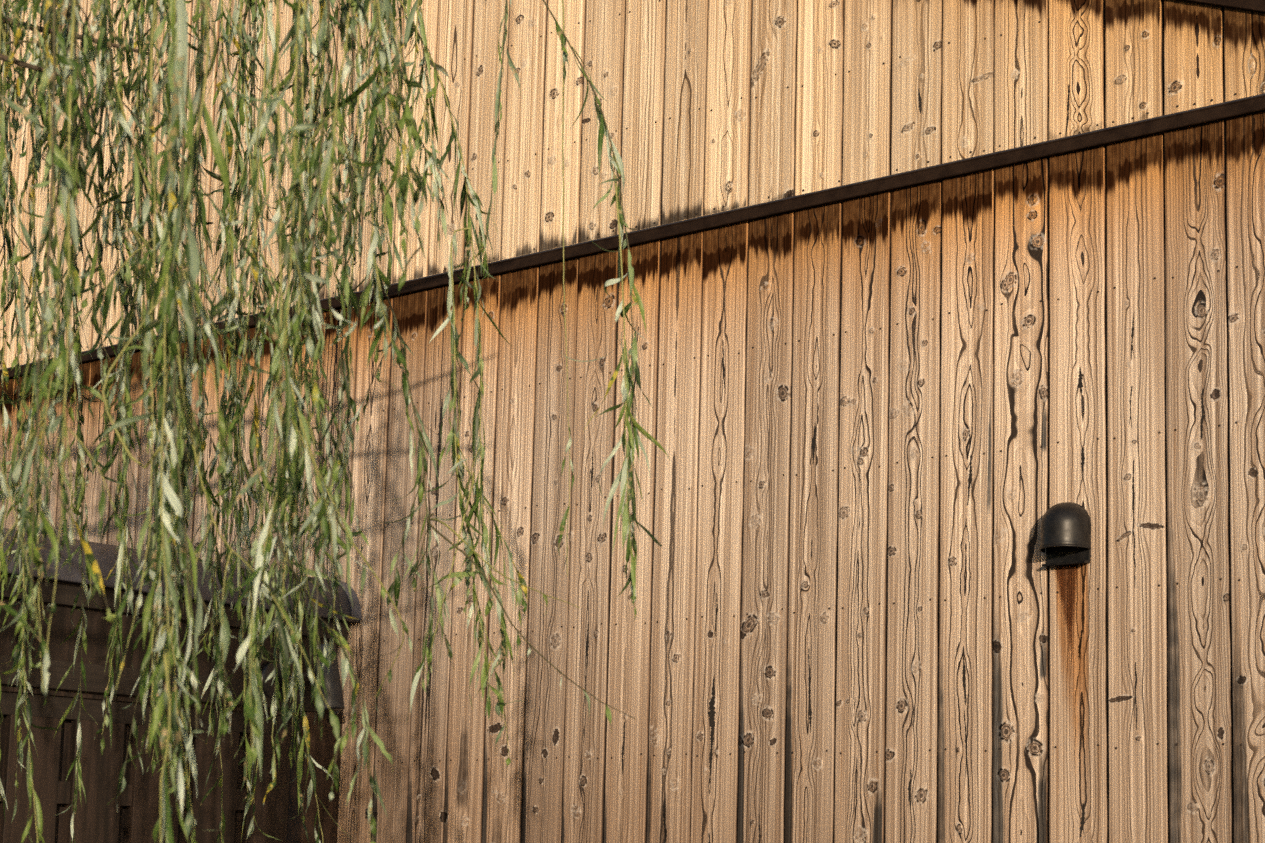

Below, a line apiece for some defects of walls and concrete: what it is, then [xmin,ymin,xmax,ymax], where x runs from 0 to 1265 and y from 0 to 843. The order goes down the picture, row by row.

rust [1057,564,1077,632]